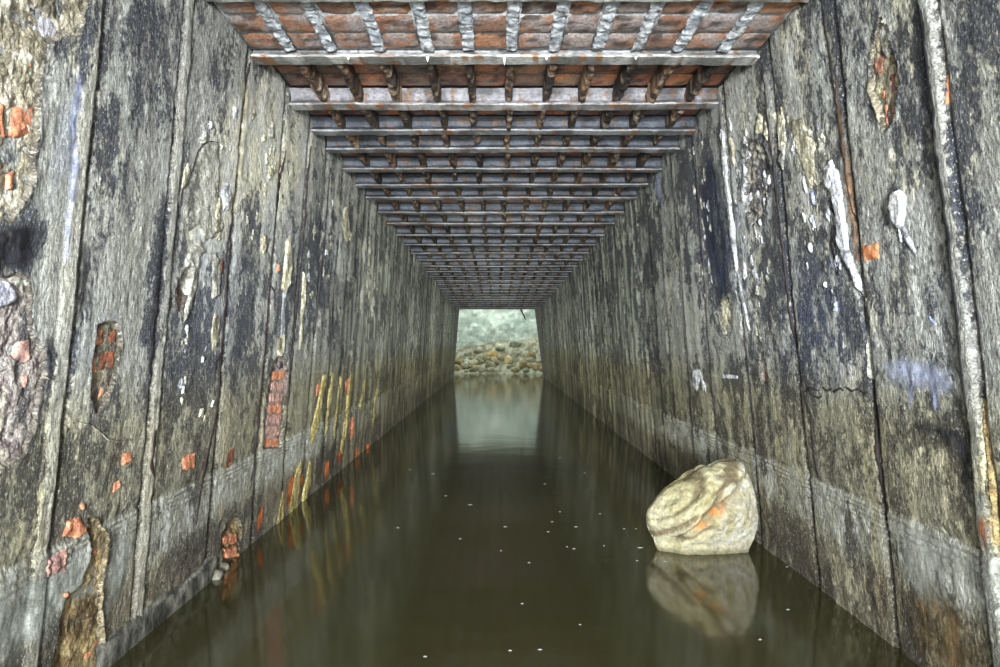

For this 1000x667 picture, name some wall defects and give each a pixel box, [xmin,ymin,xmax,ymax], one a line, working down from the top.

damp [0,225,32,270]
flaking render [0,0,89,223]
flaking render [90,320,123,415]
flaking render [263,224,332,449]
crack [719,62,895,580]
crack [821,0,871,342]
damp [823,160,875,380]
flaking render [867,17,899,132]
damp [890,364,944,408]
flaking render [46,503,110,667]
flaking render [221,517,243,563]